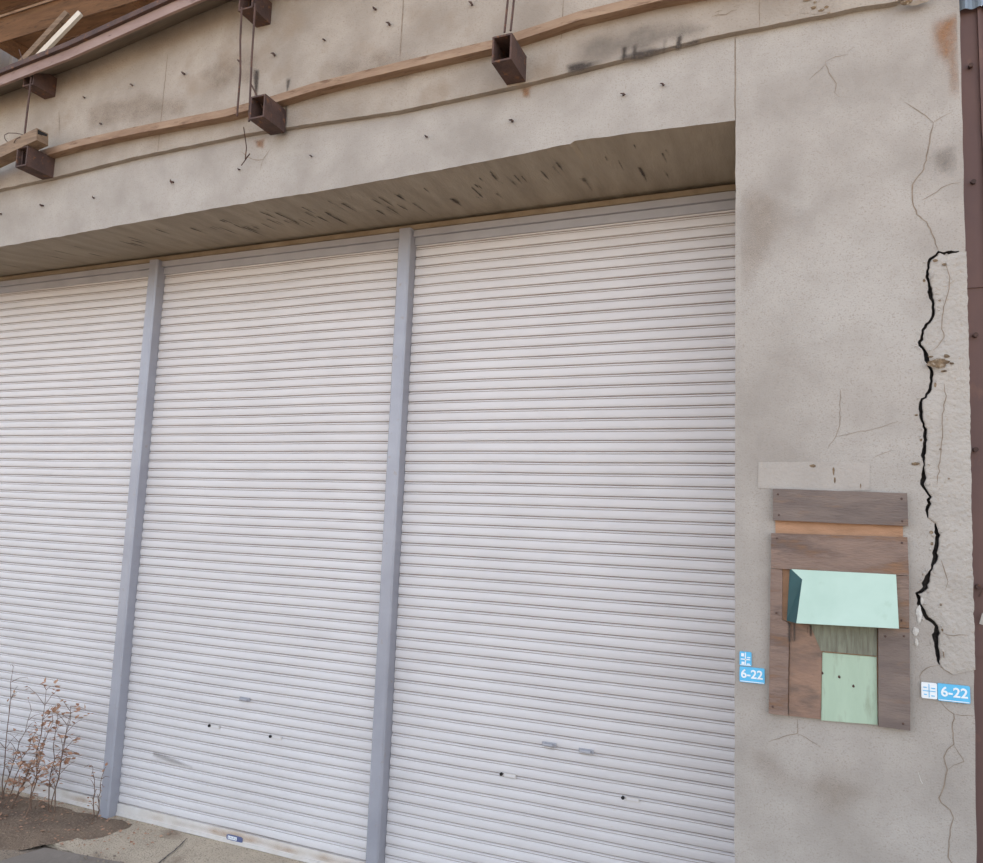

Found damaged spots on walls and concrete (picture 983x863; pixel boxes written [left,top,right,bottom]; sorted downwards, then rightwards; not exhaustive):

crack [830,102,961,683]
crack [938,701,972,863]